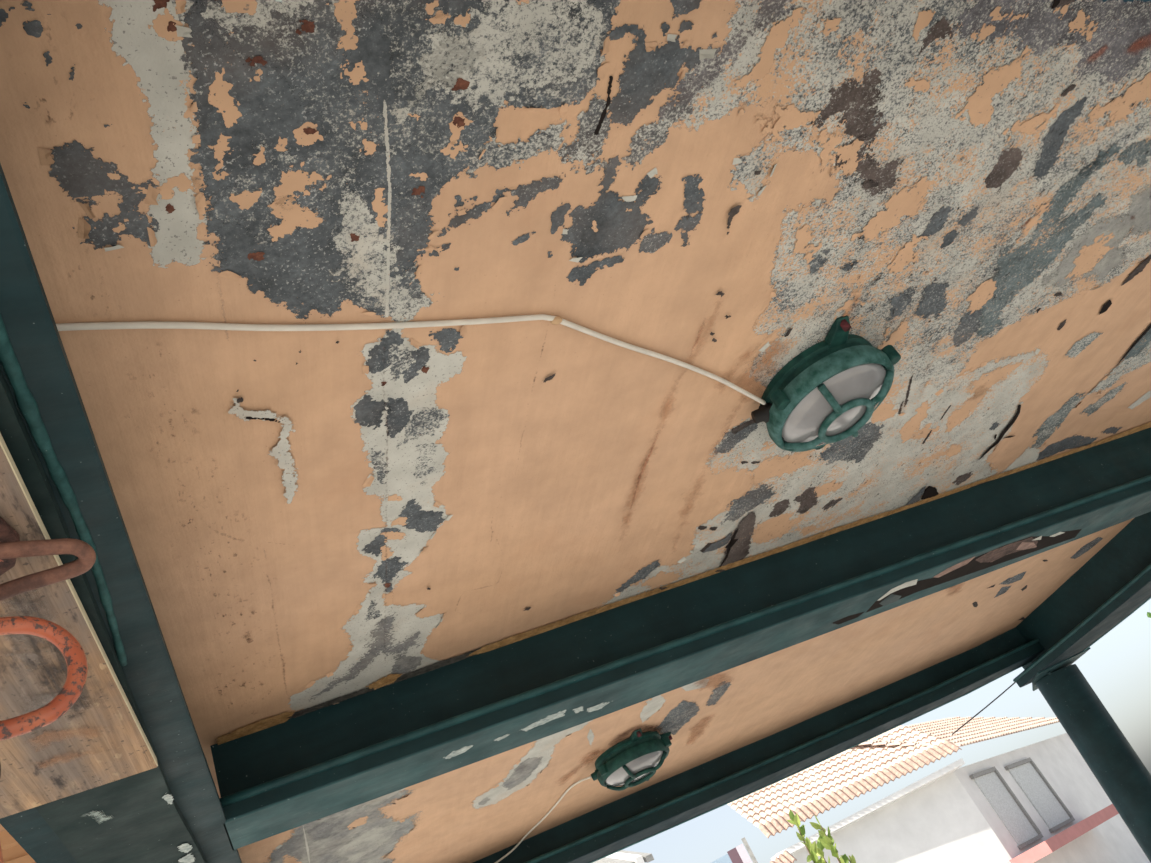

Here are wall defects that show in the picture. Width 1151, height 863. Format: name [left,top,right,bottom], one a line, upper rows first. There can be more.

peeling [0,1,51,38]
peeling [38,0,1151,711]
peeling [640,678,731,735]
spalling [443,745,473,759]
peeling [471,702,609,809]
peeling [265,788,423,863]